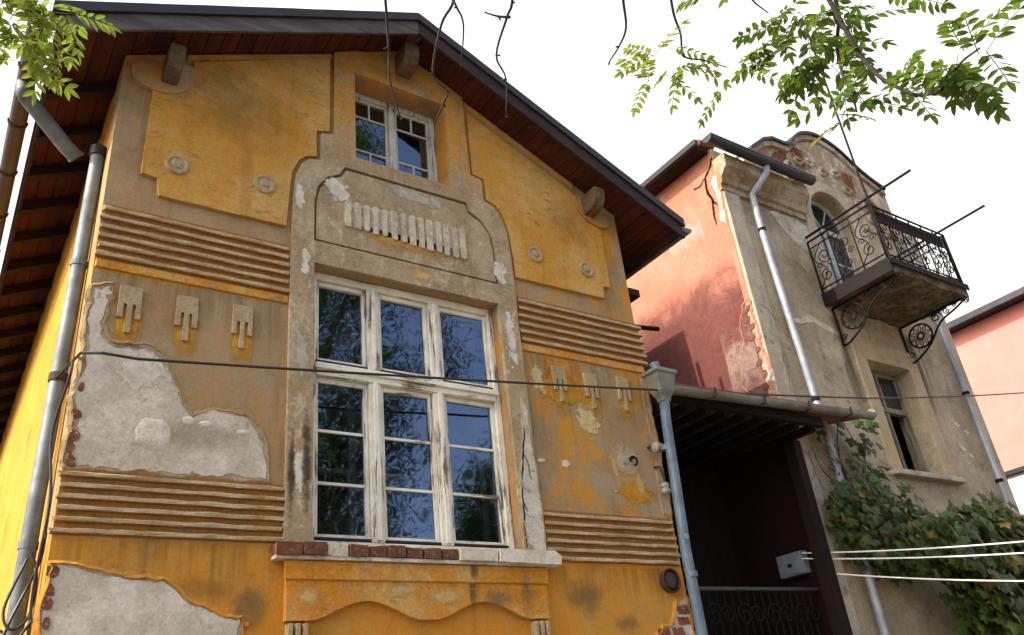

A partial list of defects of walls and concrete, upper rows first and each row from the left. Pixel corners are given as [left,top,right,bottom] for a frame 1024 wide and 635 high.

peeling [325,177,352,202]
peeling [493,261,507,286]
flaking render [58,281,272,484]
spalling [739,298,777,398]
crack [520,429,531,548]
flaking render [614,444,640,476]
flaking render [32,560,249,635]